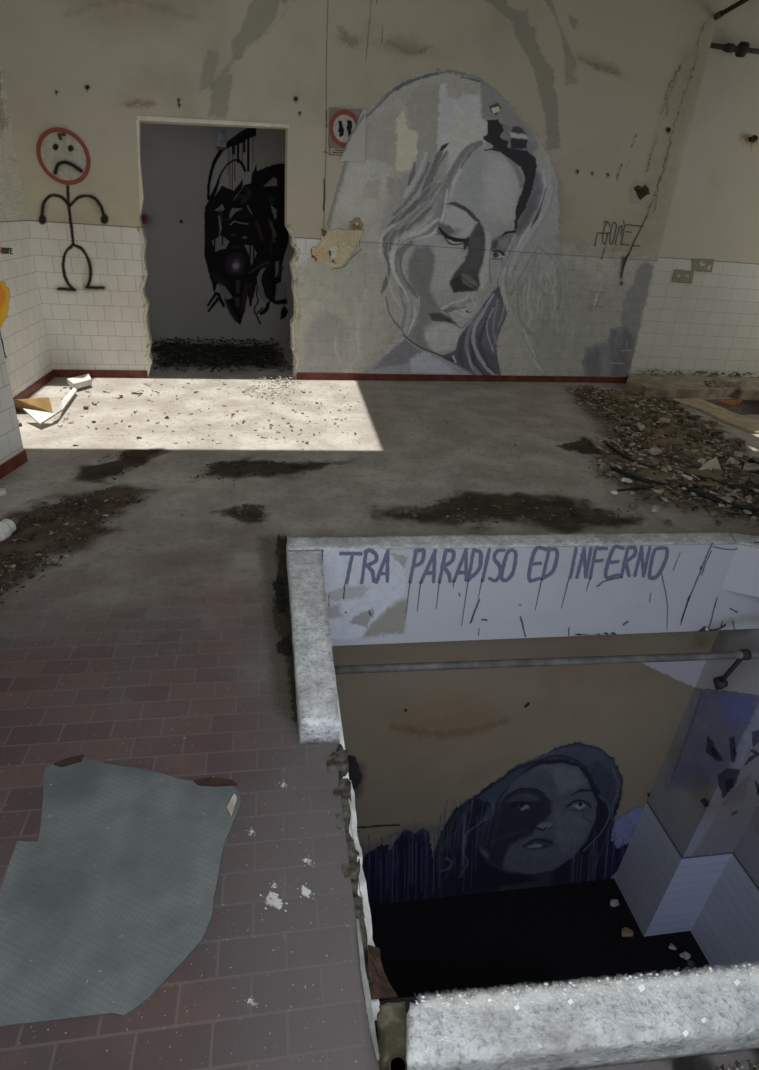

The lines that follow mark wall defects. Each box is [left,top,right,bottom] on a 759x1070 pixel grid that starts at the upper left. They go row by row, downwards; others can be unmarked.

spalling [287,218,364,369]
peeling [322,547,407,640]